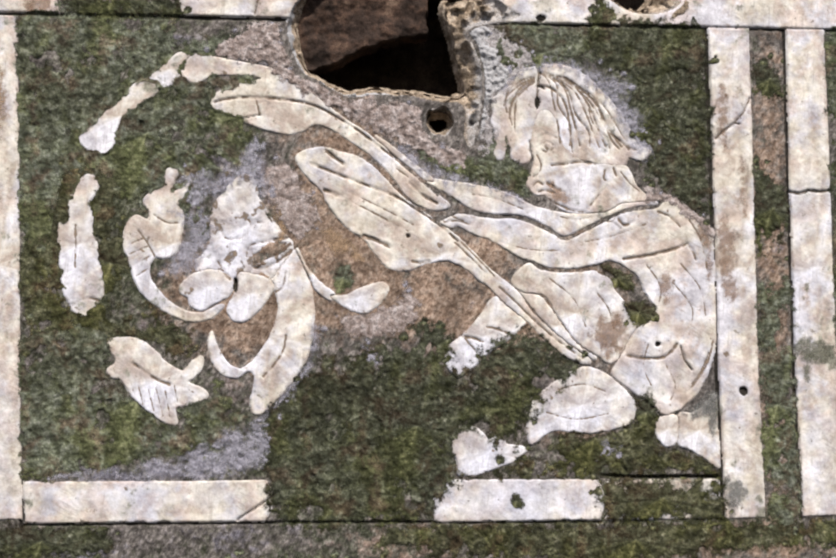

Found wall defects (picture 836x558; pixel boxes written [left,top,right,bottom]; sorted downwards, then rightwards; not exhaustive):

spalling [204,0,661,184]
spalling [611,0,689,19]